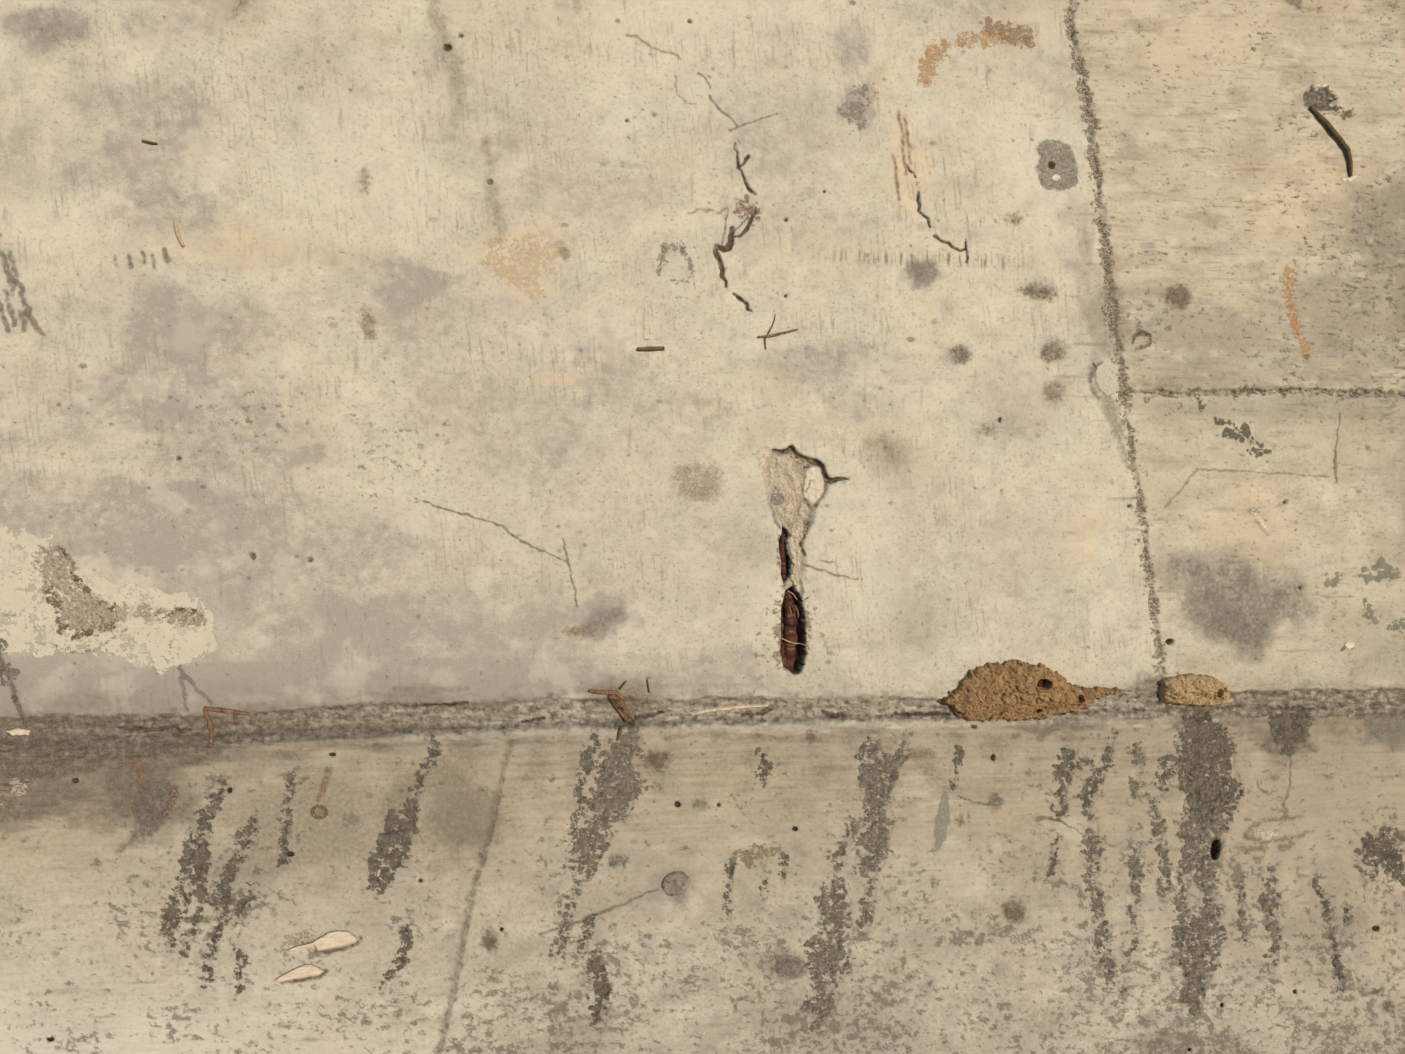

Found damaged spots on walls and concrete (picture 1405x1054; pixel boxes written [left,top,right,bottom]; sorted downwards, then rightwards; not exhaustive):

corrosion [918,18,1035,87]
crack [627,35,778,312]
crack [907,166,969,263]
corrosion [1282,266,1311,360]
peeling [0,525,218,686]
crack [415,498,577,603]
spalling [768,445,849,674]
peeling [6,728,30,736]
peeling [0,777,34,808]